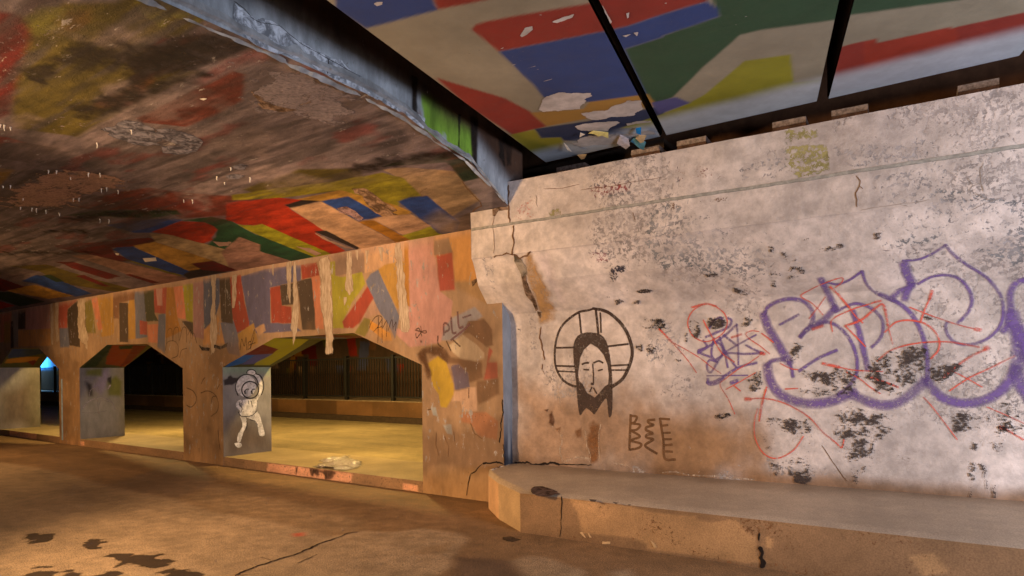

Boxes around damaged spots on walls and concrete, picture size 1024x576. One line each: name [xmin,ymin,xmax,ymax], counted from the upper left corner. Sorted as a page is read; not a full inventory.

spalling [101,120,203,155]
spalling [137,0,508,220]
peeling [538,92,655,148]
peeling [0,170,125,208]
crack [435,400,591,496]
crack [235,532,353,576]